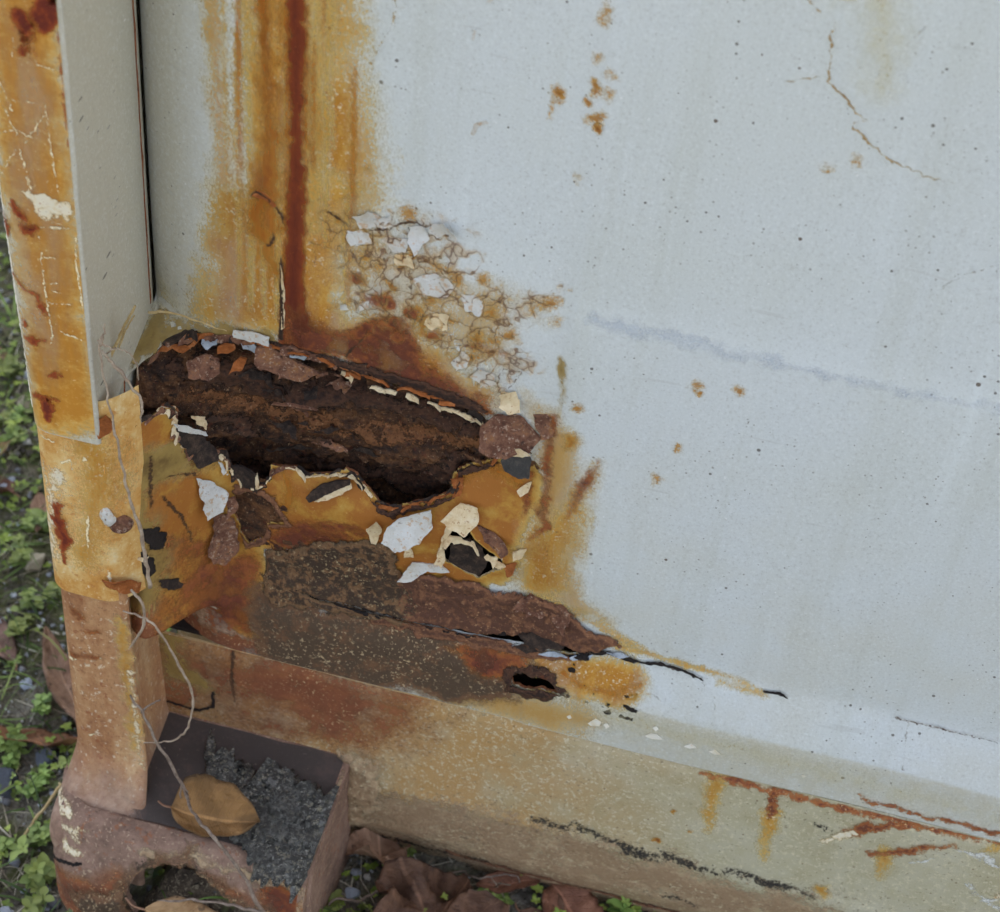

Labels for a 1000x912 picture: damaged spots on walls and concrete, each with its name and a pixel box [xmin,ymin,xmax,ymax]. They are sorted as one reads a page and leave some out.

crack [788,31,937,180]
peeling [157,329,320,382]
corrosion [0,0,725,833]
peeling [174,416,259,566]
peeling [305,479,352,503]
peeling [366,477,527,583]
peeling [159,578,183,590]
crack [587,650,703,681]
crack [763,690,788,699]
corrosion [699,771,1000,861]
corrosion [194,863,303,912]
corrosion [445,849,679,912]